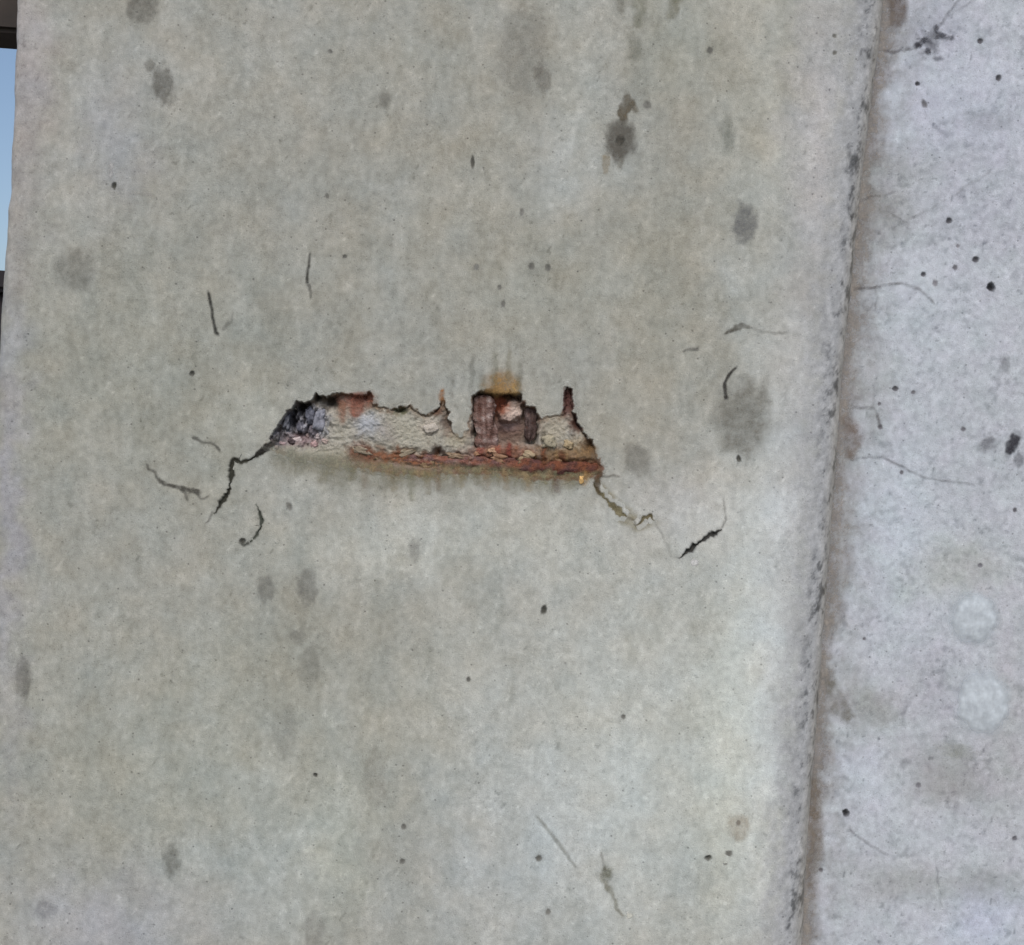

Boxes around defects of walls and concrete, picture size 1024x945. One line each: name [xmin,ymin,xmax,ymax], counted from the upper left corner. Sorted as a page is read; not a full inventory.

damp [605,95,635,160]
corrosion [490,374,517,393]
spalling [260,381,608,486]
crack [148,435,279,547]
corrosion [281,443,599,487]
crack [586,471,659,531]
crack [674,523,725,563]